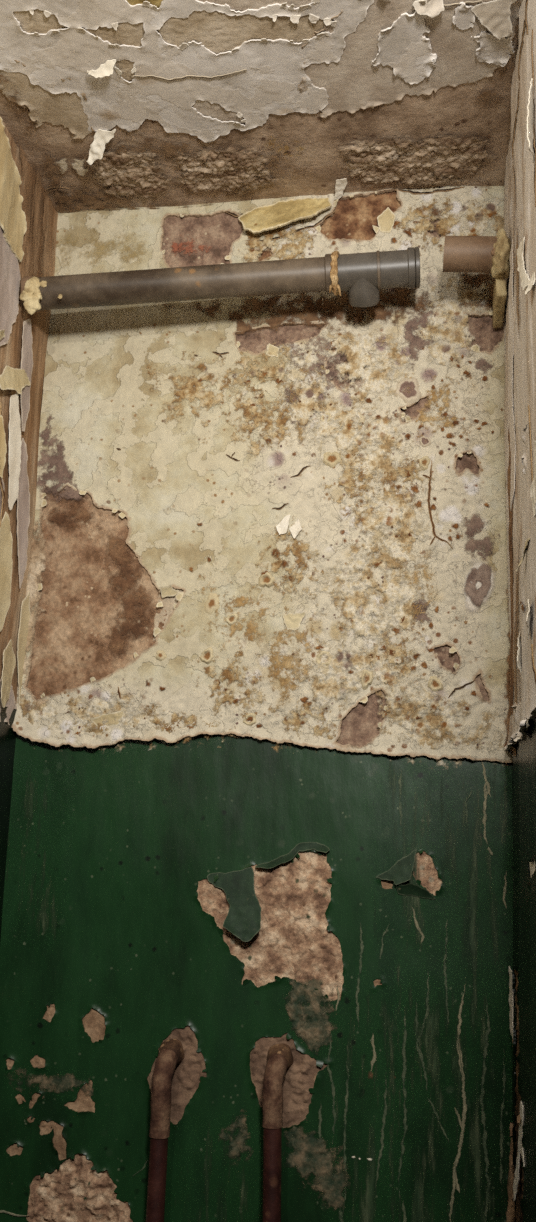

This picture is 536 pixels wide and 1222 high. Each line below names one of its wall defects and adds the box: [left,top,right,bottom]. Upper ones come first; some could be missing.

peeling [13,0,337,82]
spalling [86,129,278,200]
spalling [162,135,497,268]
leakage [431,167,520,327]
leakage [37,416,98,528]
peeling [0,319,184,713]
leakage [163,272,521,767]
leakage [105,535,151,655]
efflorescence [18,691,154,750]
spalling [197,851,344,1001]
spalling [250,1032,328,1128]
spalling [15,1092,133,1222]